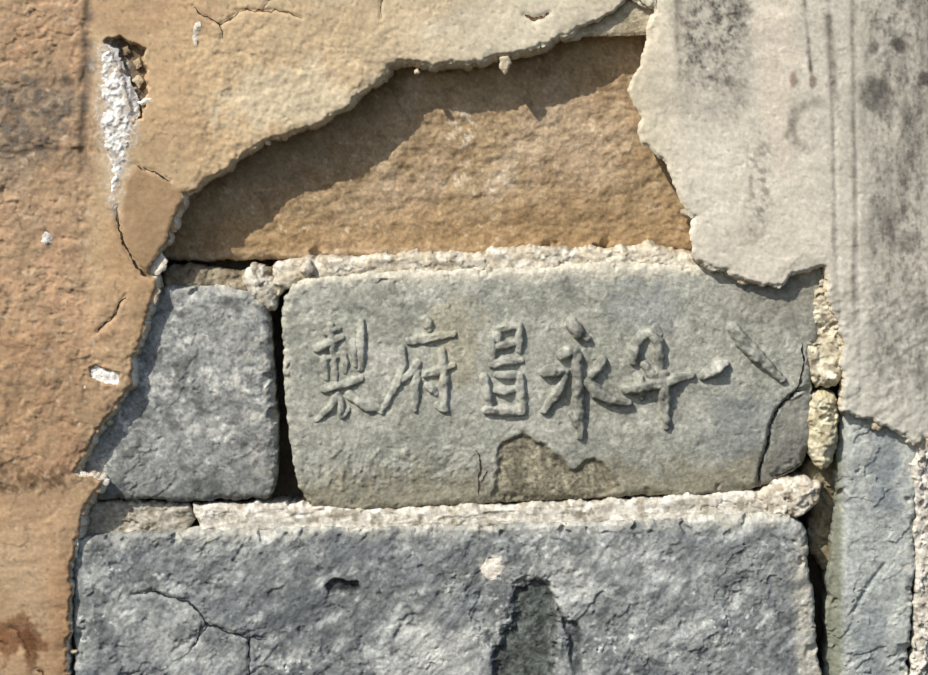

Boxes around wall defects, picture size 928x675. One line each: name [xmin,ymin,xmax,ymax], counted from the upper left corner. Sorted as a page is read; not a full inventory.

crack [194,0,301,37]
leakage [685,0,746,67]
leakage [896,64,928,195]
spalling [41,231,53,245]
leakage [879,204,908,250]
spalling [66,0,654,675]
spalling [690,253,857,418]
crack [758,344,806,482]
spalling [871,419,928,446]
crack [144,591,266,675]